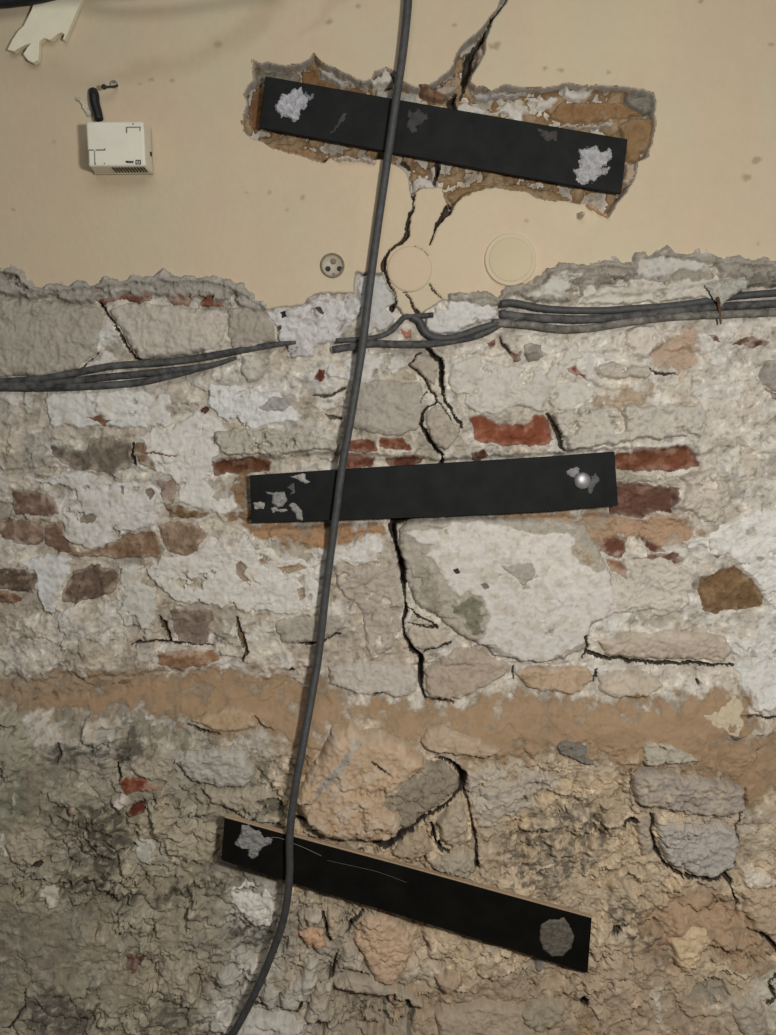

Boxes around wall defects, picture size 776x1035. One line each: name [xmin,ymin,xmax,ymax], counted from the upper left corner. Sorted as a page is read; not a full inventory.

flaking render [242,0,657,220]
flaking render [0,264,411,359]
crack [380,161,453,313]
flaking render [424,245,776,335]
crack [408,348,463,463]
peeling [0,384,450,670]
crack [388,518,454,704]
flaking render [609,445,699,519]
crack [581,635,734,686]
peeling [592,508,776,618]
crack [360,756,480,867]
crack [612,768,747,908]